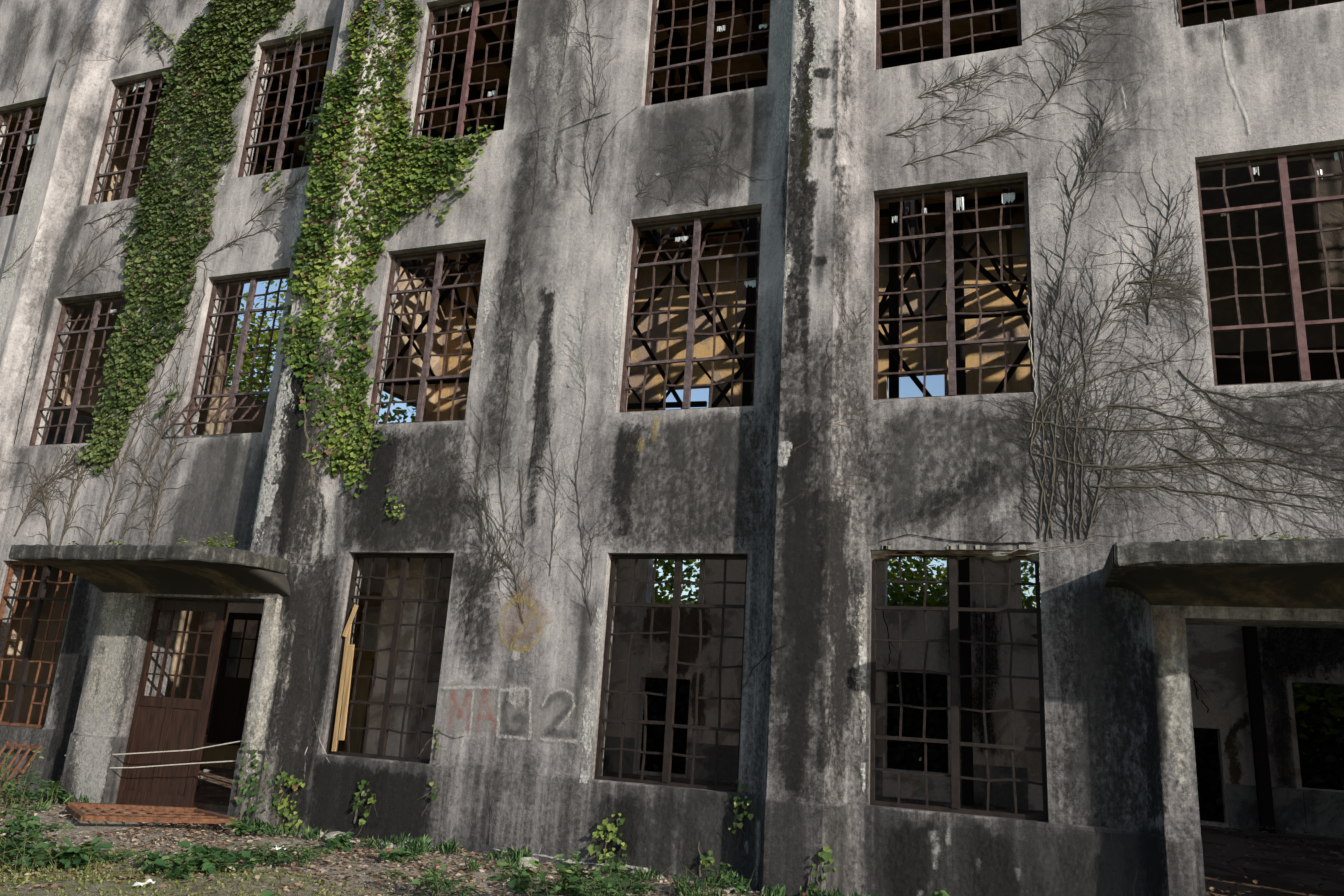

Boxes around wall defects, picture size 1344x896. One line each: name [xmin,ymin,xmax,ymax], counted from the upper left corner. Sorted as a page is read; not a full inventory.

damp [173,338,495,842]
damp [480,0,579,525]
damp [590,794,767,887]
damp [602,0,1032,825]
damp [1220,384,1344,493]